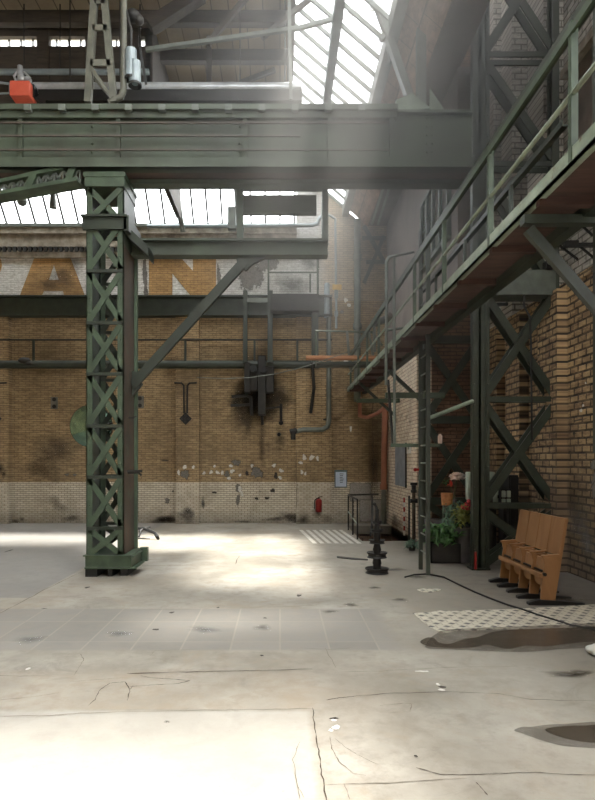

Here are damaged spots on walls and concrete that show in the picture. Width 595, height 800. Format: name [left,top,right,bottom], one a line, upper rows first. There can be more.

spalling [177,460,264,480]
crack [2,654,213,716]
crack [292,692,427,800]
crack [393,767,582,795]